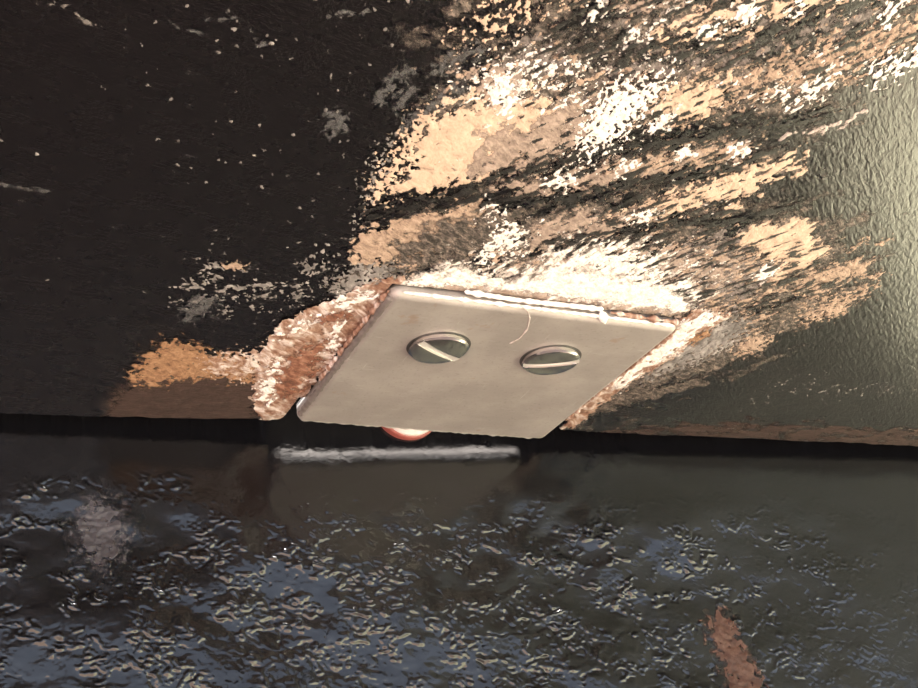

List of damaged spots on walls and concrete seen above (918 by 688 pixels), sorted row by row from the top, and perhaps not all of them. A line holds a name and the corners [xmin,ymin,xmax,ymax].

peeling [168,0,918,432]
water stain [357,0,918,336]
rust [101,307,354,419]
rust [602,416,918,446]
rust [699,605,769,688]